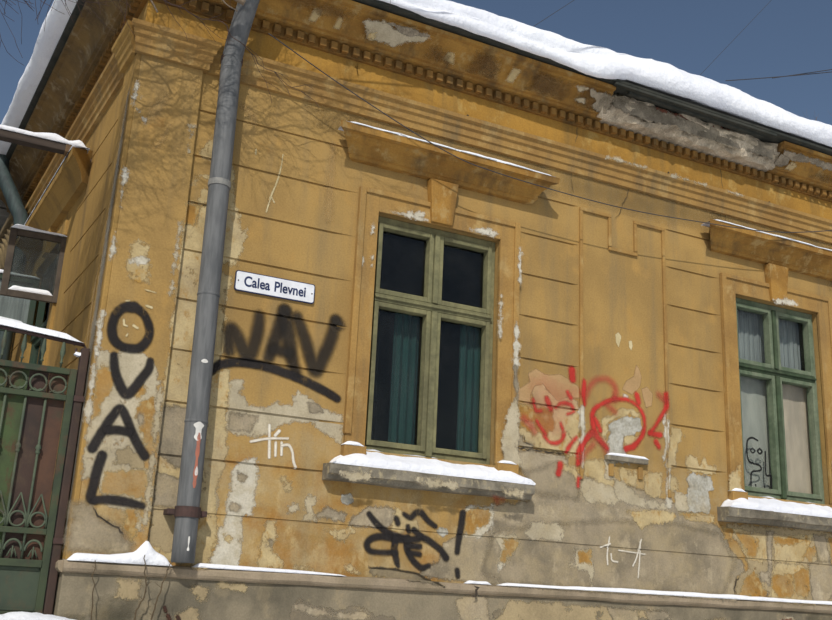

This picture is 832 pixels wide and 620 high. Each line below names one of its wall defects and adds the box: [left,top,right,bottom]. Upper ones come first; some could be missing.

flaking render [363,20,430,47]
flaking render [576,86,832,171]
peeling [395,211,429,221]
peeling [471,227,497,237]
peeling [67,165,344,572]
peeling [339,470,372,481]
peeling [416,325,832,620]
peeling [286,493,419,541]
peeling [114,577,144,601]
peeling [174,581,248,620]
peeling [293,600,370,620]